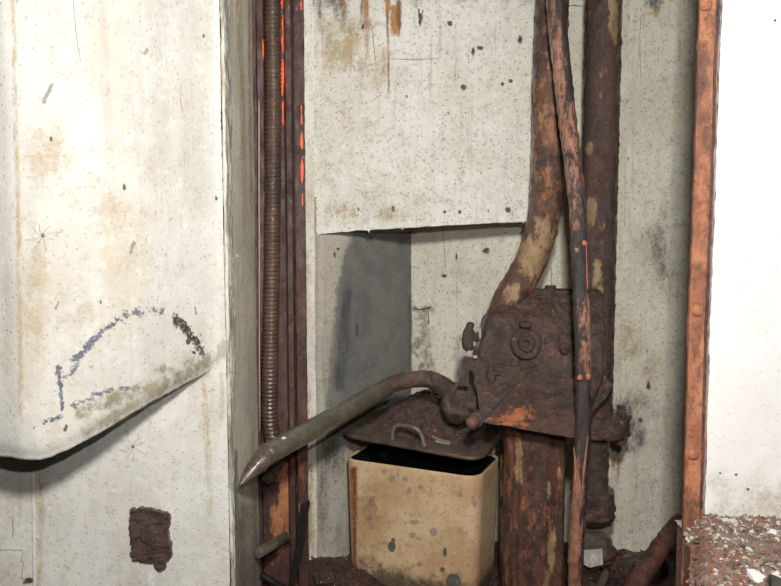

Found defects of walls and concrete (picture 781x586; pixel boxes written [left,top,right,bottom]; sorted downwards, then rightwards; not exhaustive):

corrosion [385,0,401,40]
leakage [327,232,412,407]
leakage [308,388,411,542]